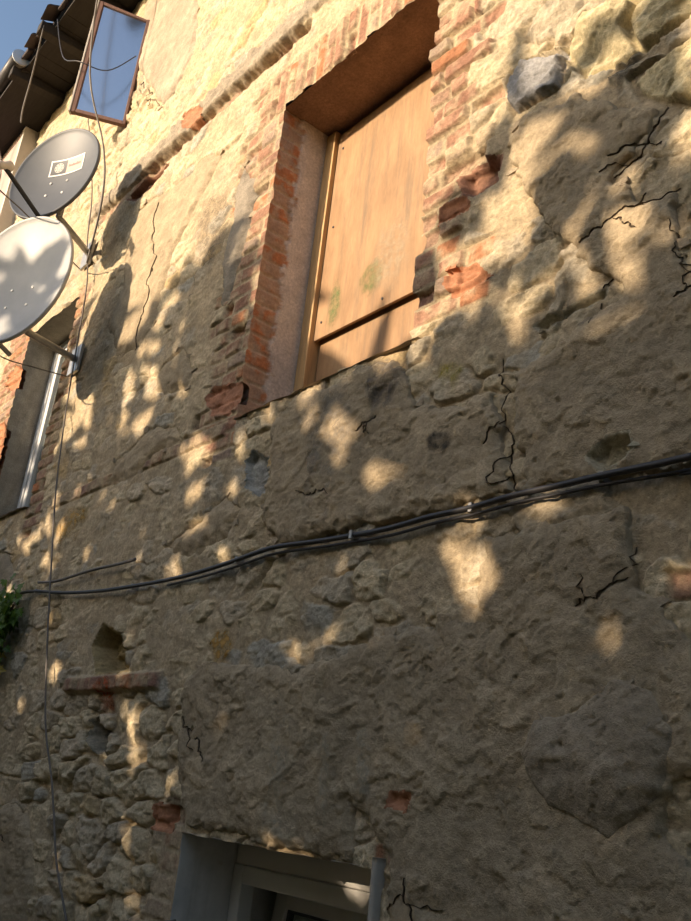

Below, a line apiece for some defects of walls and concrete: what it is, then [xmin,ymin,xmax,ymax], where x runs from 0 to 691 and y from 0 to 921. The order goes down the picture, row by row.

crack [599,107,669,178]
crack [579,188,691,297]
spalling [4,366,23,391]
spalling [92,622,130,676]
spalling [86,716,113,757]